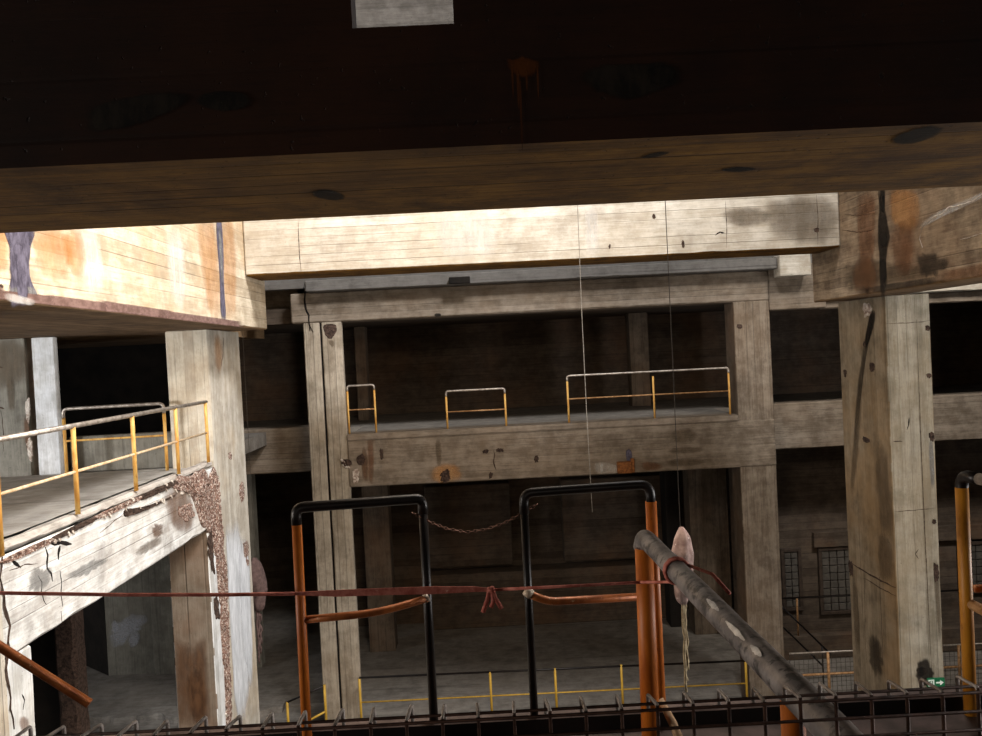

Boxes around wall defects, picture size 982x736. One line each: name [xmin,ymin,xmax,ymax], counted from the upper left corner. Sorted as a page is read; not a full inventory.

corrosion [866,254,945,293]
water stain [852,312,875,475]
crack [0,518,87,729]
spalling [0,467,232,725]